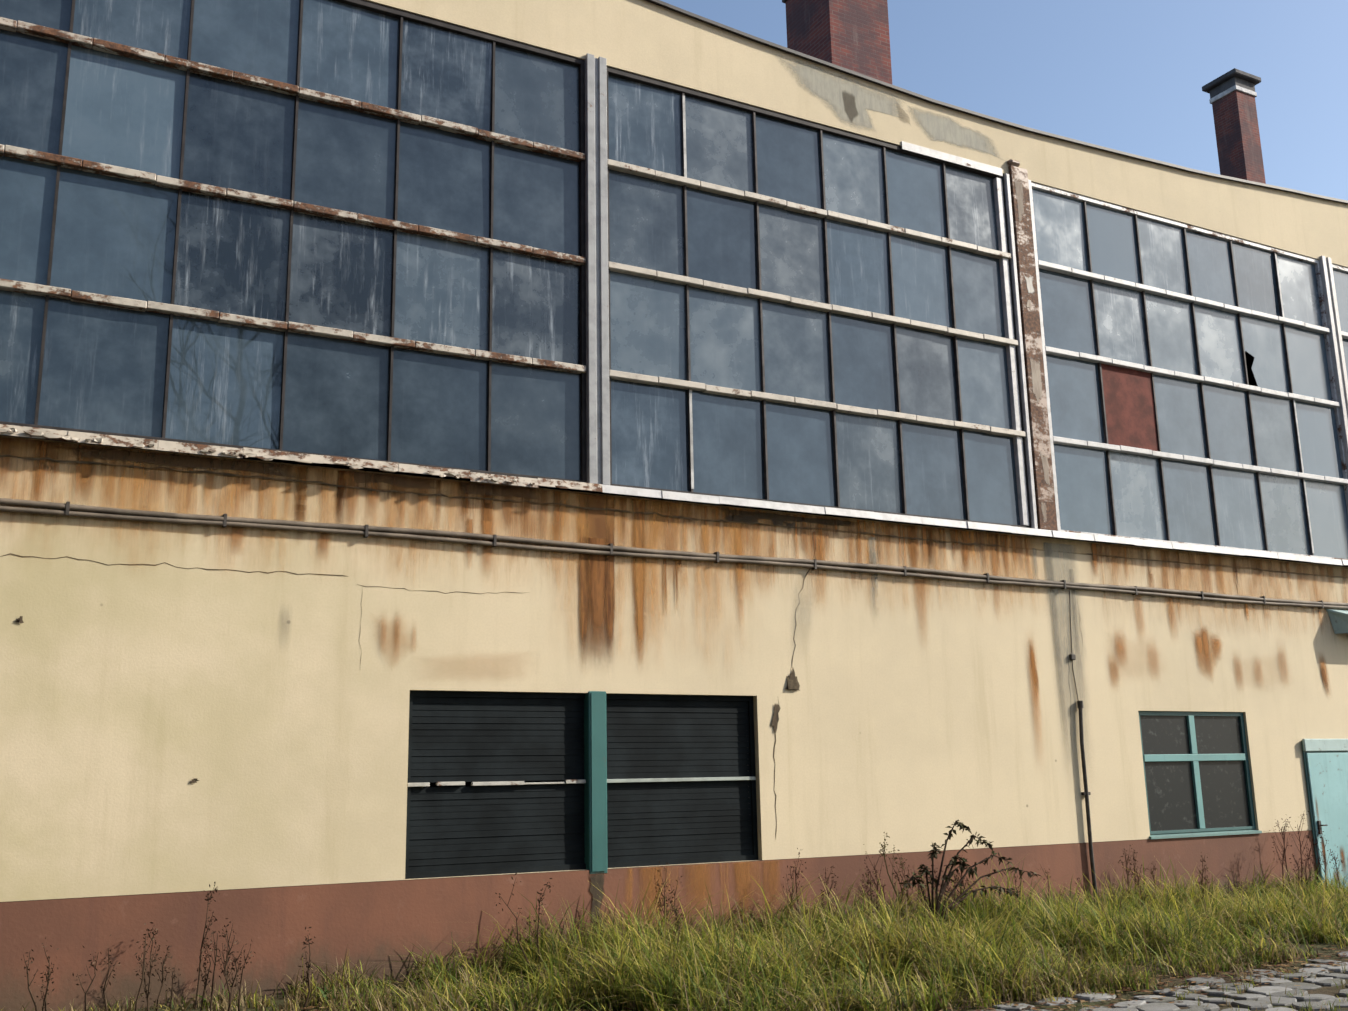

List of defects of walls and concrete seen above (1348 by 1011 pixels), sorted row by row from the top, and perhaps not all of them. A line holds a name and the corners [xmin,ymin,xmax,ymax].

peeling [789,63,996,156]
rust [76,444,151,510]
spalling [0,428,312,477]
rust [287,466,400,521]
spalling [333,460,536,499]
crack [0,455,1001,664]
rust [463,483,775,649]
rust [794,515,838,571]
rust [857,520,1029,575]
rust [1030,646,1038,704]
rust [1196,630,1219,671]
crack [772,700,780,832]